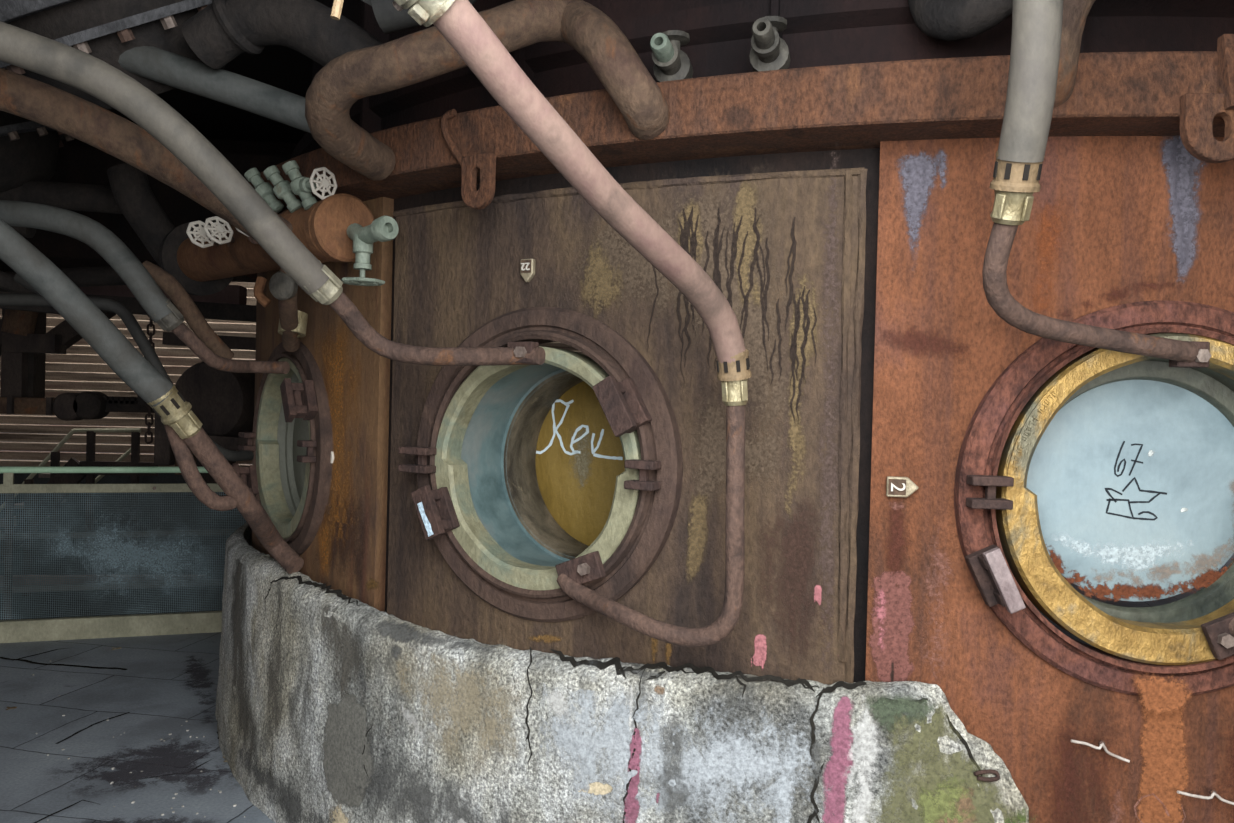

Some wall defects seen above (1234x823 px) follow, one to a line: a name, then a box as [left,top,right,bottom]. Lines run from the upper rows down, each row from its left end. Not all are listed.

corrosion [1046,544,1234,601]
damp [70,740,229,791]
damp [232,559,336,823]
damp [321,606,363,697]
crack [525,647,982,823]
corrosion [1135,676,1191,823]
crack [34,800,101,823]